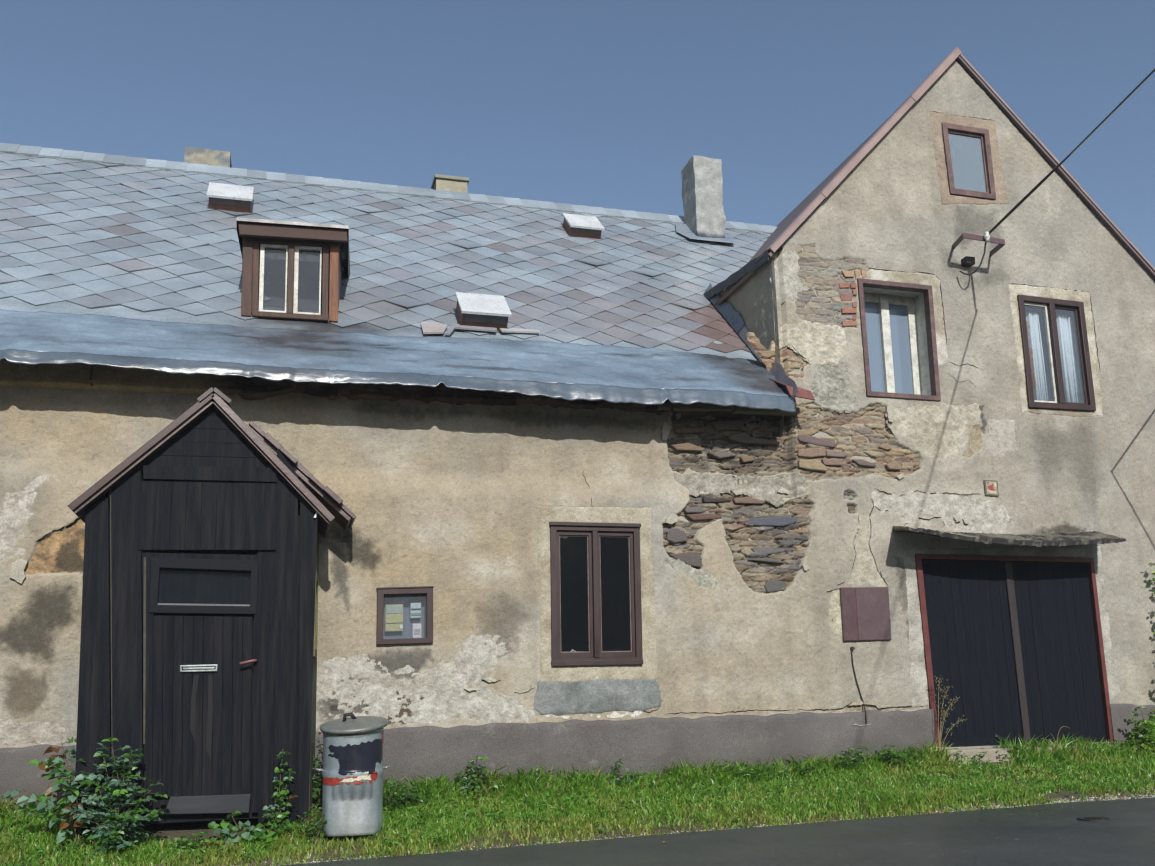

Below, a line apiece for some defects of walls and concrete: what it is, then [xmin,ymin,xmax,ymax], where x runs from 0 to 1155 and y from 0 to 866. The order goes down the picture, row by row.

flaking render [661,244,1014,643]
flaking render [0,474,85,584]
leakage [56,540,84,570]
leakage [333,532,379,599]
crack [827,490,976,592]
leakage [0,586,71,659]
flaking render [316,633,540,729]